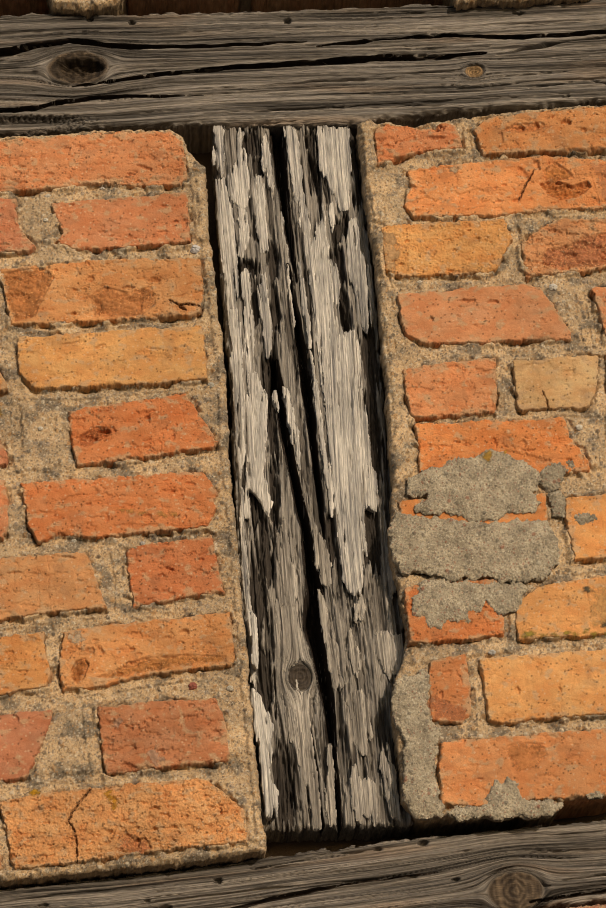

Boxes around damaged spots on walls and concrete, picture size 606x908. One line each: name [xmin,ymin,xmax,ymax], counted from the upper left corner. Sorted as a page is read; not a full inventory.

crack [68,790,90,863]